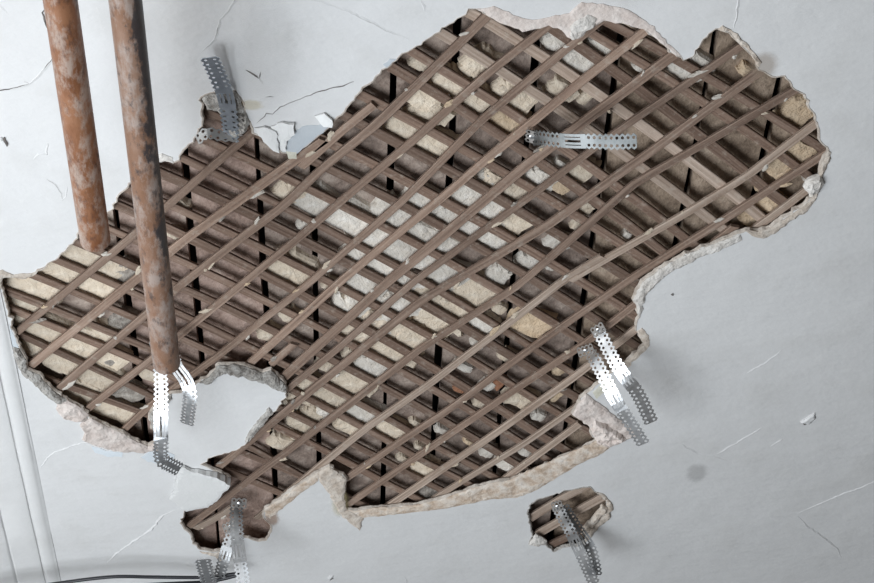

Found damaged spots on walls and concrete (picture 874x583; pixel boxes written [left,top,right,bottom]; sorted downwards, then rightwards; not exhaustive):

crack [0,58,52,91]
crack [309,0,410,41]
flaking render [0,232,288,561]
flaking render [159,2,831,552]